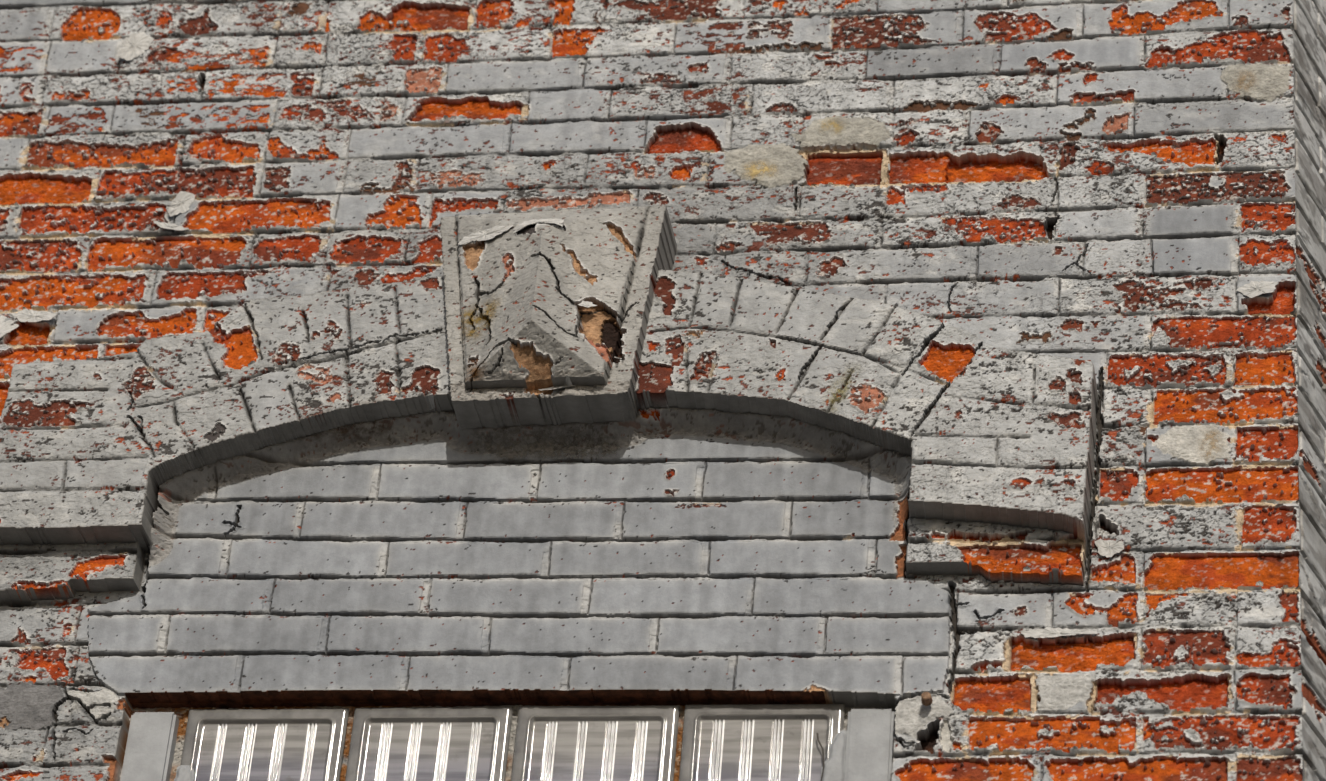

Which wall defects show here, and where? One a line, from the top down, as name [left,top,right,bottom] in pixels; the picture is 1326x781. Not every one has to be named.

crack [246,277,518,391]
crack [531,251,639,338]
crack [776,298,856,380]
crack [902,282,958,376]
peeling [204,422,227,442]
peeling [798,0,1326,781]
crack [1086,366,1105,592]
peeling [12,552,130,603]
peeling [0,623,75,684]
crack [893,581,1005,748]
peeling [1,748,46,781]
peeling [103,754,122,781]